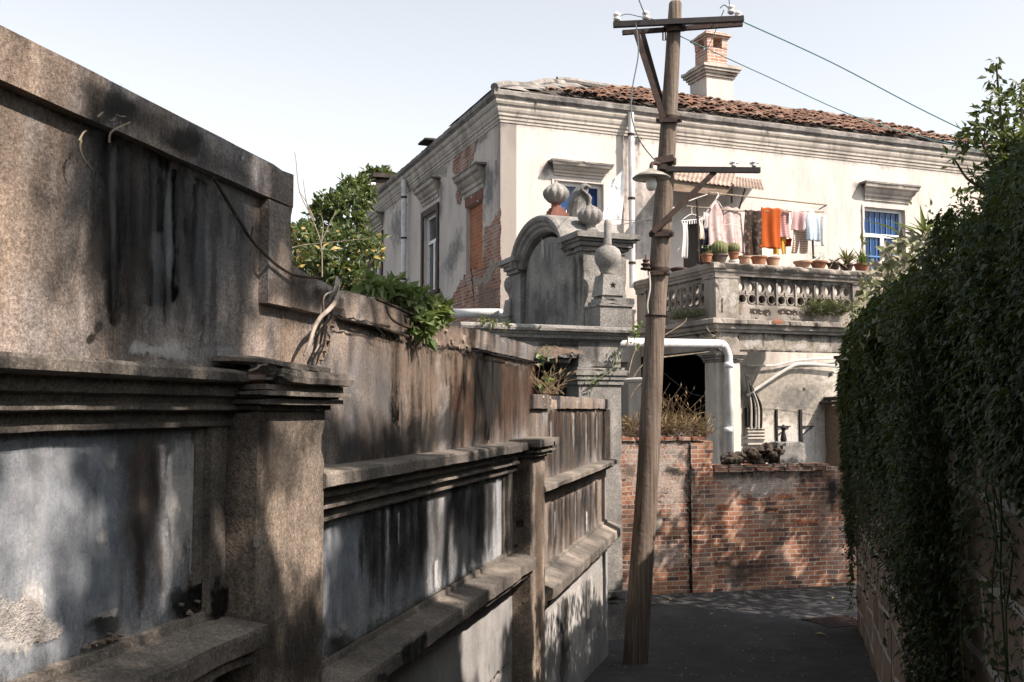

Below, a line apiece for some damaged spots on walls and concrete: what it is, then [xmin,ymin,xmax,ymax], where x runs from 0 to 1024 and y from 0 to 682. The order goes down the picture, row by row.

flaking render [452,133,486,205]
flaking render [377,208,502,436]
damp [342,354,502,463]
damp [549,410,606,469]
peeling [0,431,129,674]
damp [210,576,229,620]
damp [403,632,427,665]
damp [360,480,494,601]